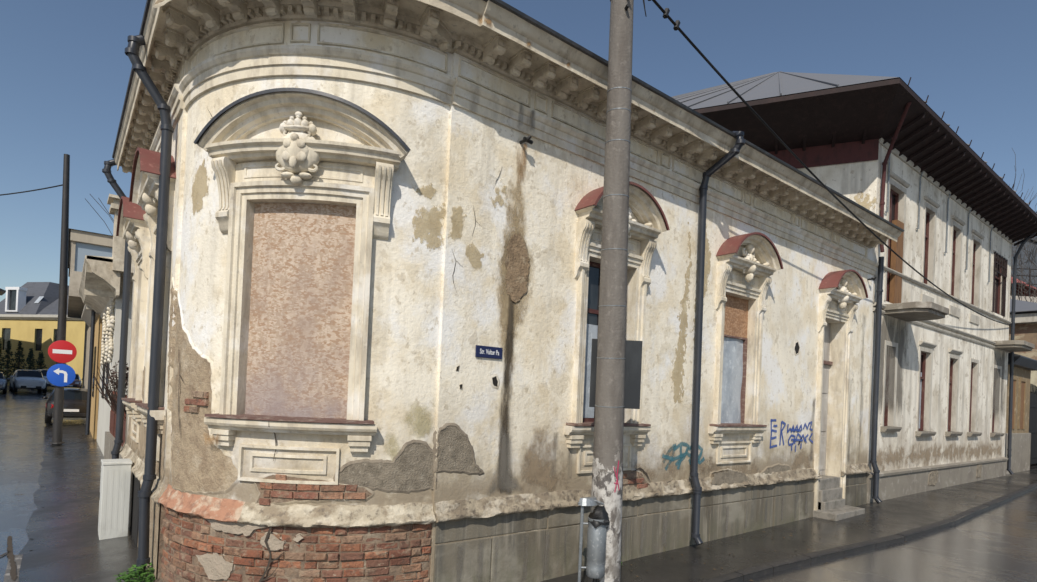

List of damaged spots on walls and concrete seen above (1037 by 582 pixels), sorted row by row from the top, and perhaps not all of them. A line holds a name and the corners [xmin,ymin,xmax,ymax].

peeling [191,159,210,215]
peeling [412,183,484,268]
peeling [127,277,485,506]
leakage [492,296,557,491]